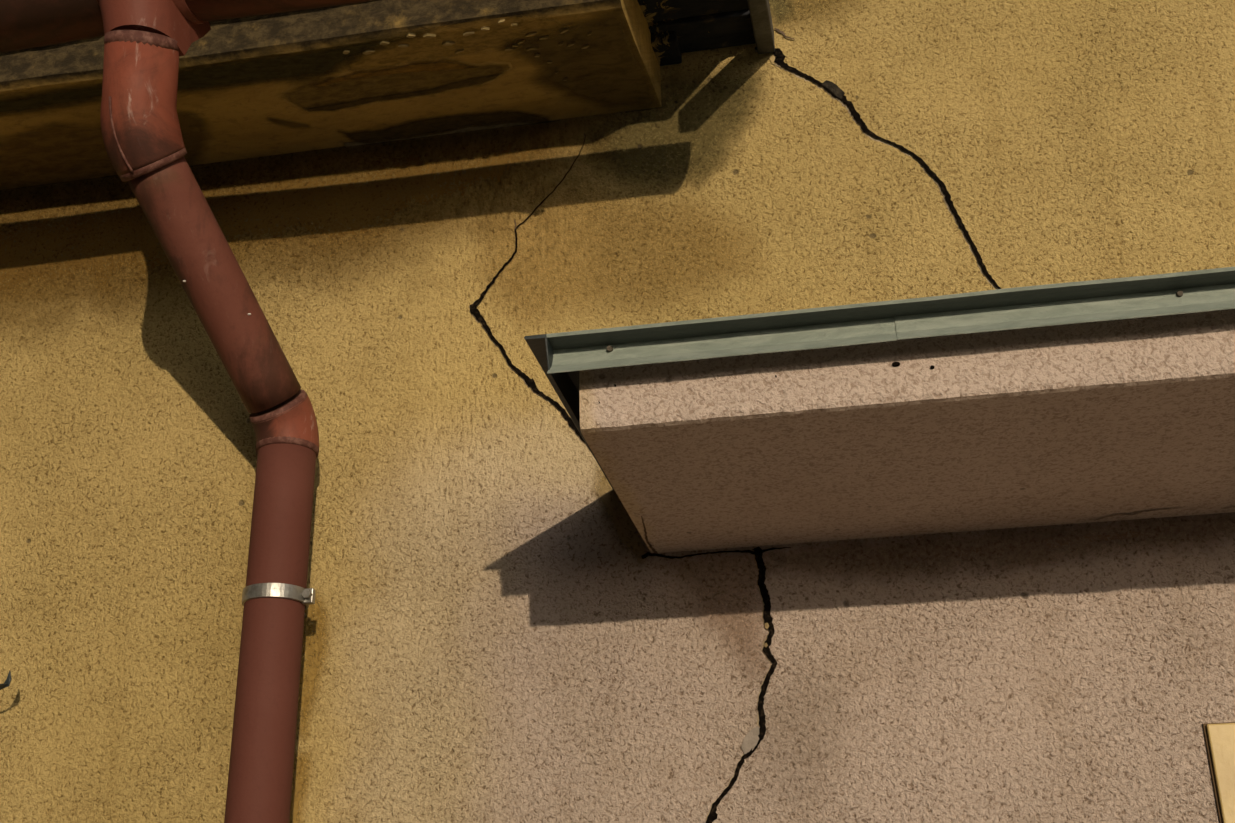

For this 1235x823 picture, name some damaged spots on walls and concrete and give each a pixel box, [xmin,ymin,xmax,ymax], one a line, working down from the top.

leakage [0,125,118,191]
leakage [177,113,207,166]
crack [755,28,1002,289]
crack [469,133,595,459]
crack [641,516,791,823]